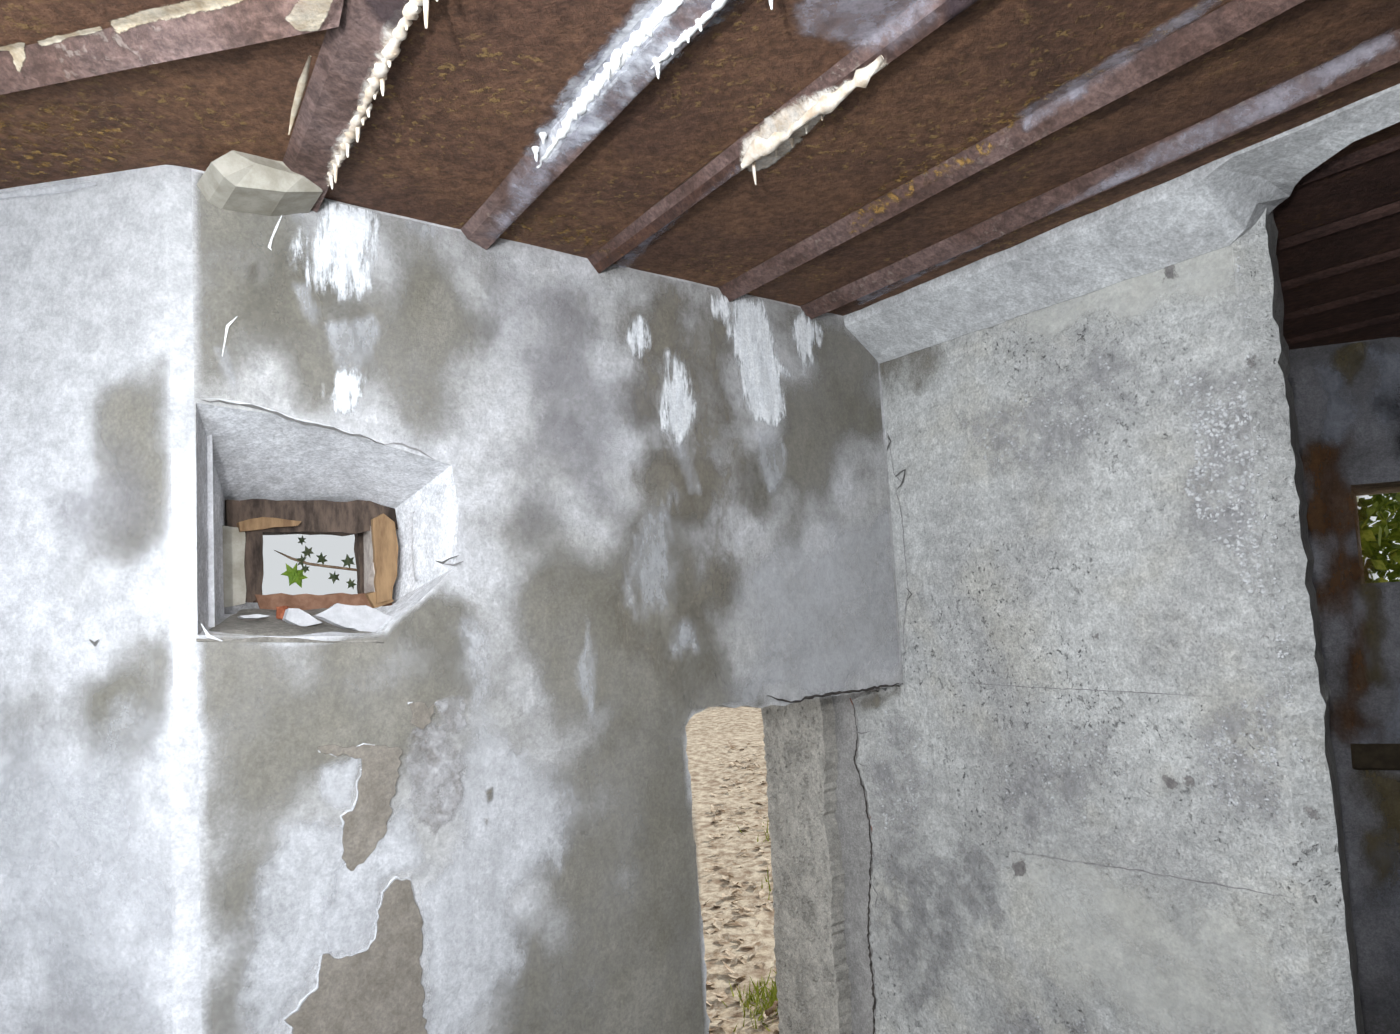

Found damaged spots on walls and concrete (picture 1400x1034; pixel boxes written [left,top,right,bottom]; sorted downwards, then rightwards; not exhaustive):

water stain [521,0,730,200]
water stain [741,0,890,171]
water stain [946,0,978,21]
water stain [198,0,481,429]
water stain [98,384,165,546]
rust [1302,440,1371,610]
peeling [318,700,466,871]
crack [767,427,912,1034]
rust [1334,624,1369,742]
peeling [283,876,427,1034]